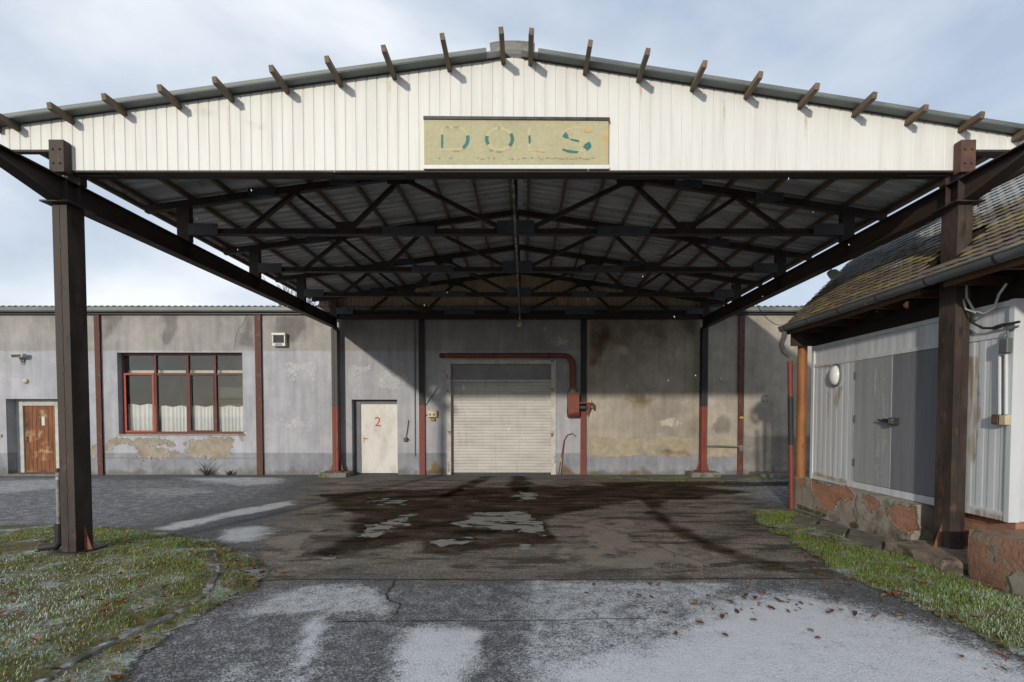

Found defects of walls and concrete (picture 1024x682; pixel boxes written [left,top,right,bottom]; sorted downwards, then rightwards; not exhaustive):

flaking render [91,435,245,461]
flaking render [587,434,694,459]
spalling [811,479,921,535]
crack [597,525,832,579]
crack [511,575,594,583]
crack [260,579,466,622]
crack [574,615,648,623]